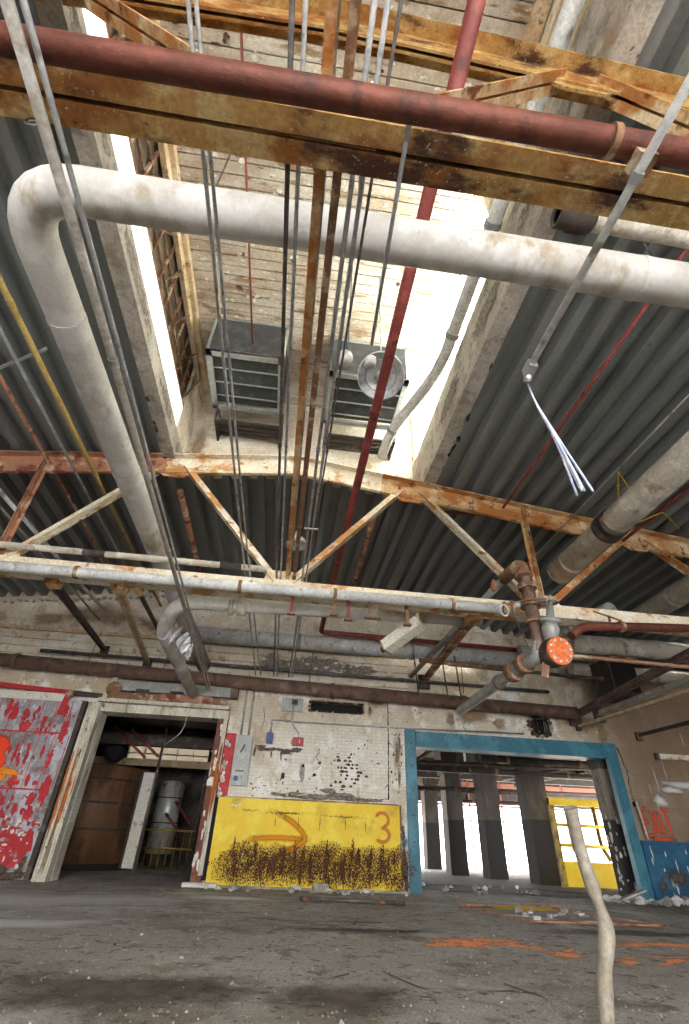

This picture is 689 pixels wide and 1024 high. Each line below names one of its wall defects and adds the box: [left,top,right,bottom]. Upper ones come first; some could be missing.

corrosion [0,19,17,60]
corrosion [21,23,689,171]
water stain [260,653,376,679]
spalling [526,716,564,739]
peeling [0,698,70,870]
peeling [207,724,242,806]
spalling [280,737,368,796]
peeling [192,810,206,872]